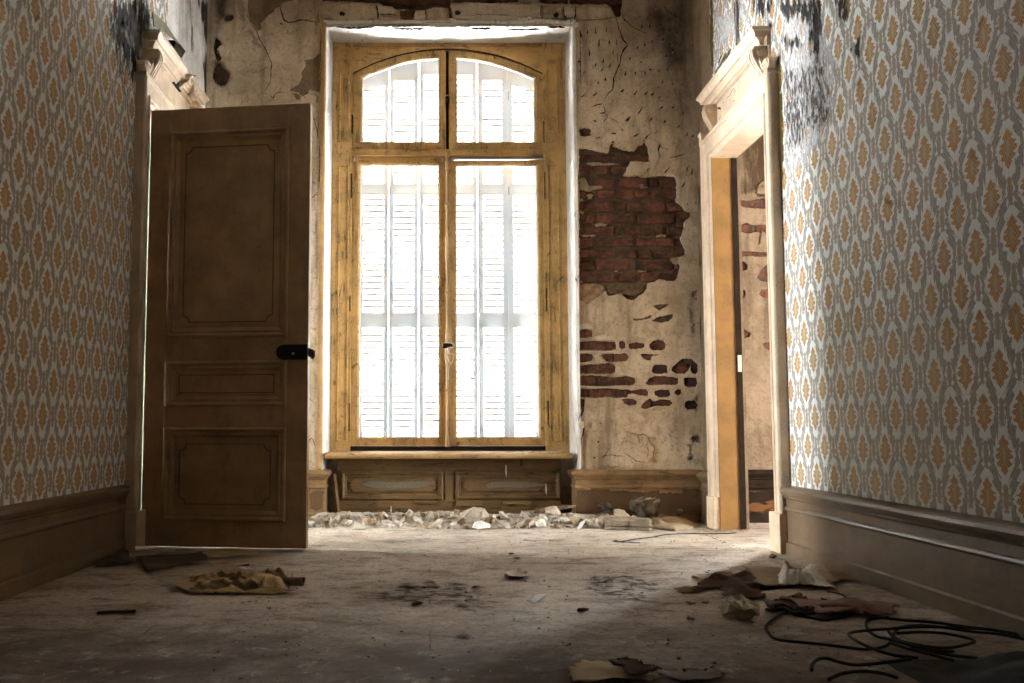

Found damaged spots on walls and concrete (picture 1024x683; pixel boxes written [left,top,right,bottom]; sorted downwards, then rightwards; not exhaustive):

flaking render [248,0,292,30]
leakage [834,0,848,23]
leakage [107,0,152,112]
peeling [213,44,230,87]
flaking render [289,54,320,100]
crack [580,15,647,122]
leakage [710,0,838,228]
flaking render [579,24,694,304]
spalling [741,180,766,209]
spalling [741,223,768,298]
spalling [579,323,698,413]